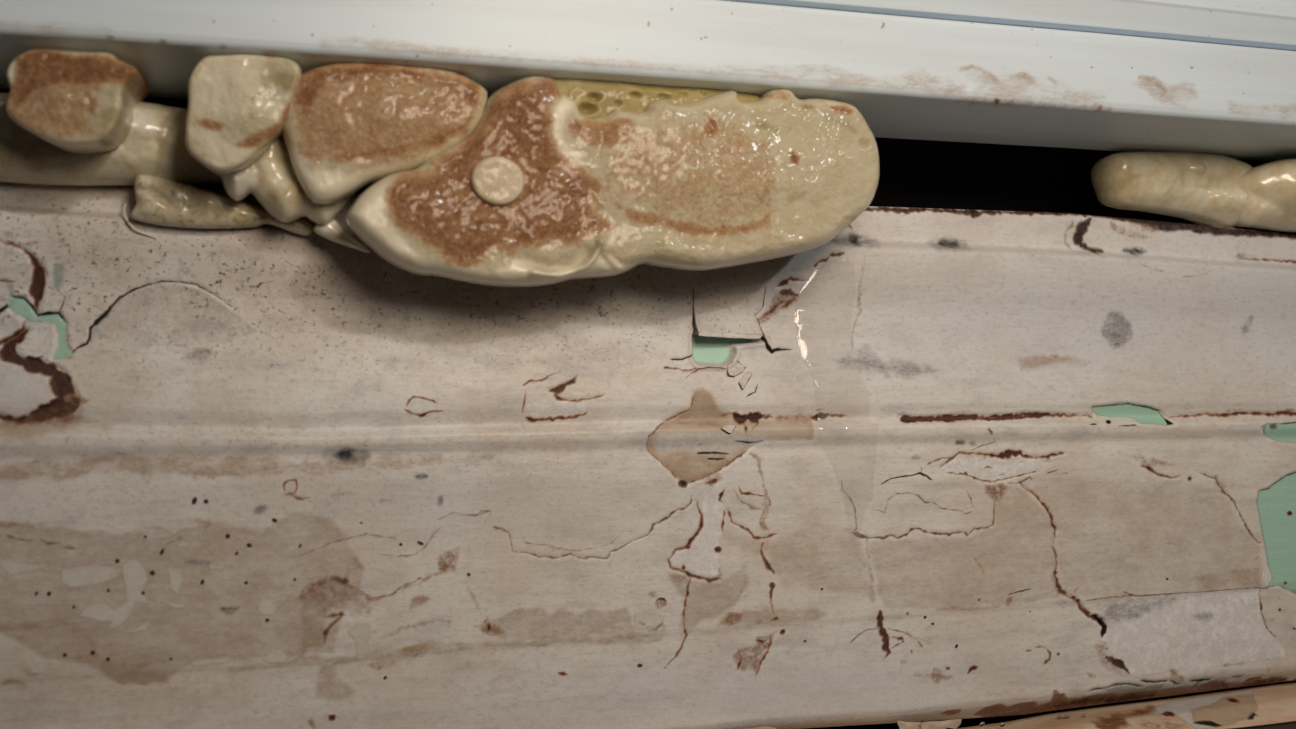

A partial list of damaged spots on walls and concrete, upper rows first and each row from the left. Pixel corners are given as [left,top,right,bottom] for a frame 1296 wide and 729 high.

peeling [8,284,72,359]
crack [0,242,231,425]
peeling [672,288,791,396]
crack [900,412,1092,447]
peeling [1091,403,1173,426]
crack [1176,409,1296,417]
peeling [1262,422,1296,443]
crack [728,455,776,607]
peeling [1257,472,1296,594]
damp [61,558,149,633]
crack [1020,483,1261,693]
crack [852,610,904,657]